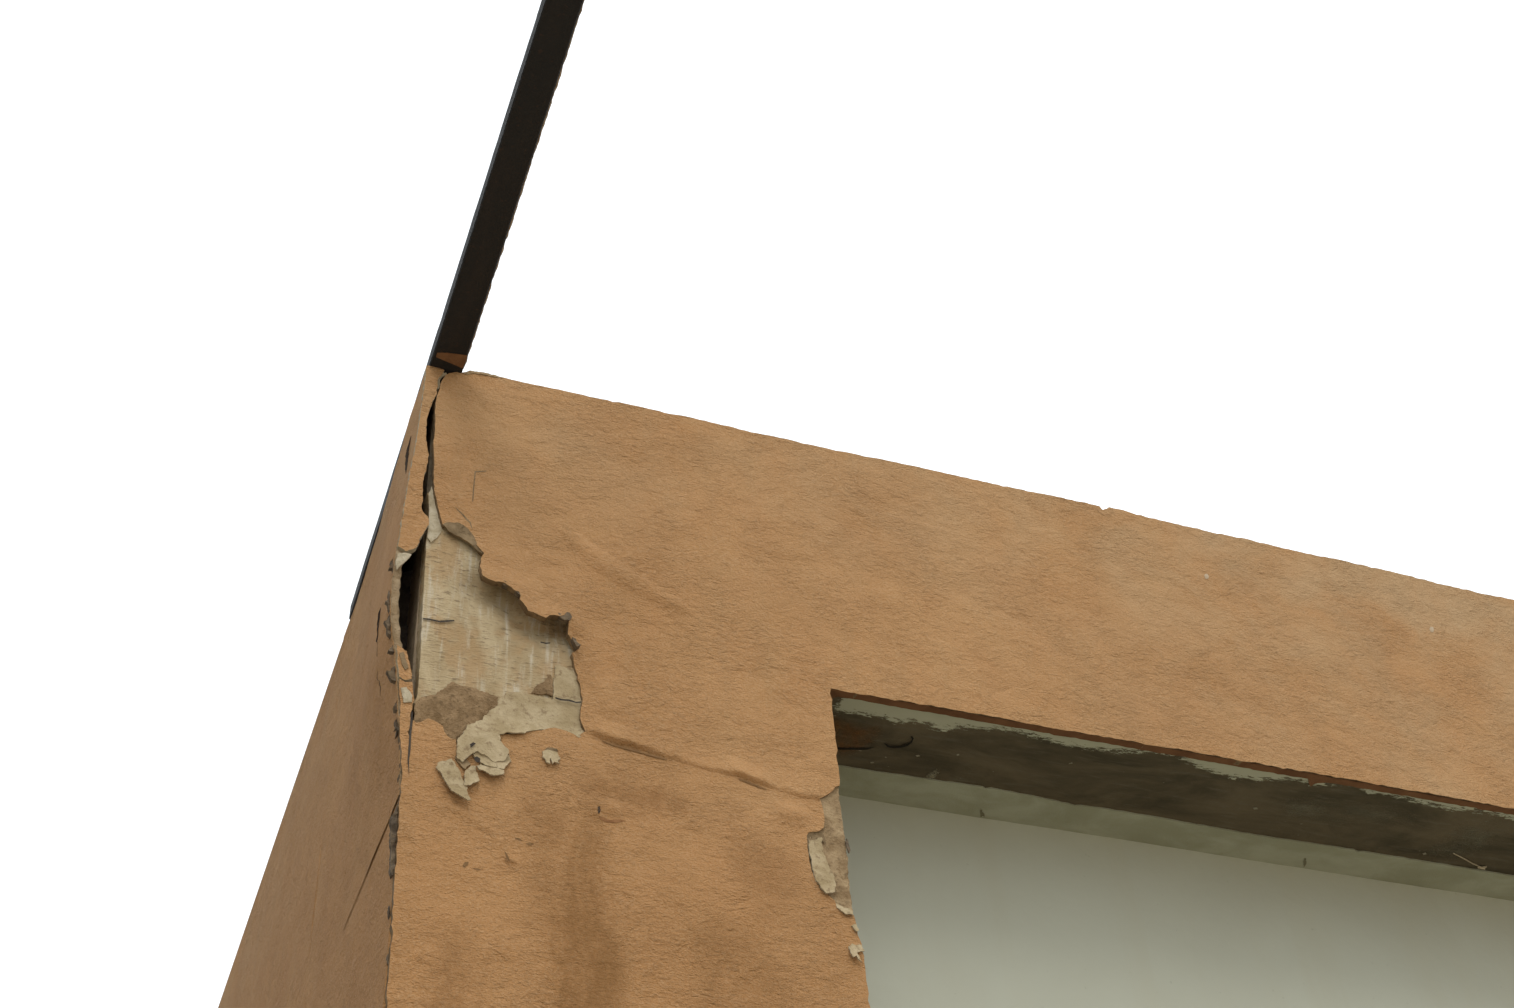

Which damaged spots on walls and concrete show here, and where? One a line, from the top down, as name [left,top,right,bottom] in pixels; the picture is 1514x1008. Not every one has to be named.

crack [405,426,428,472]
crack [456,471,486,528]
crack [376,548,417,692]
flaking render [410,487,584,801]
crack [406,711,414,770]
flaking render [388,771,401,879]
flaking render [807,787,864,963]